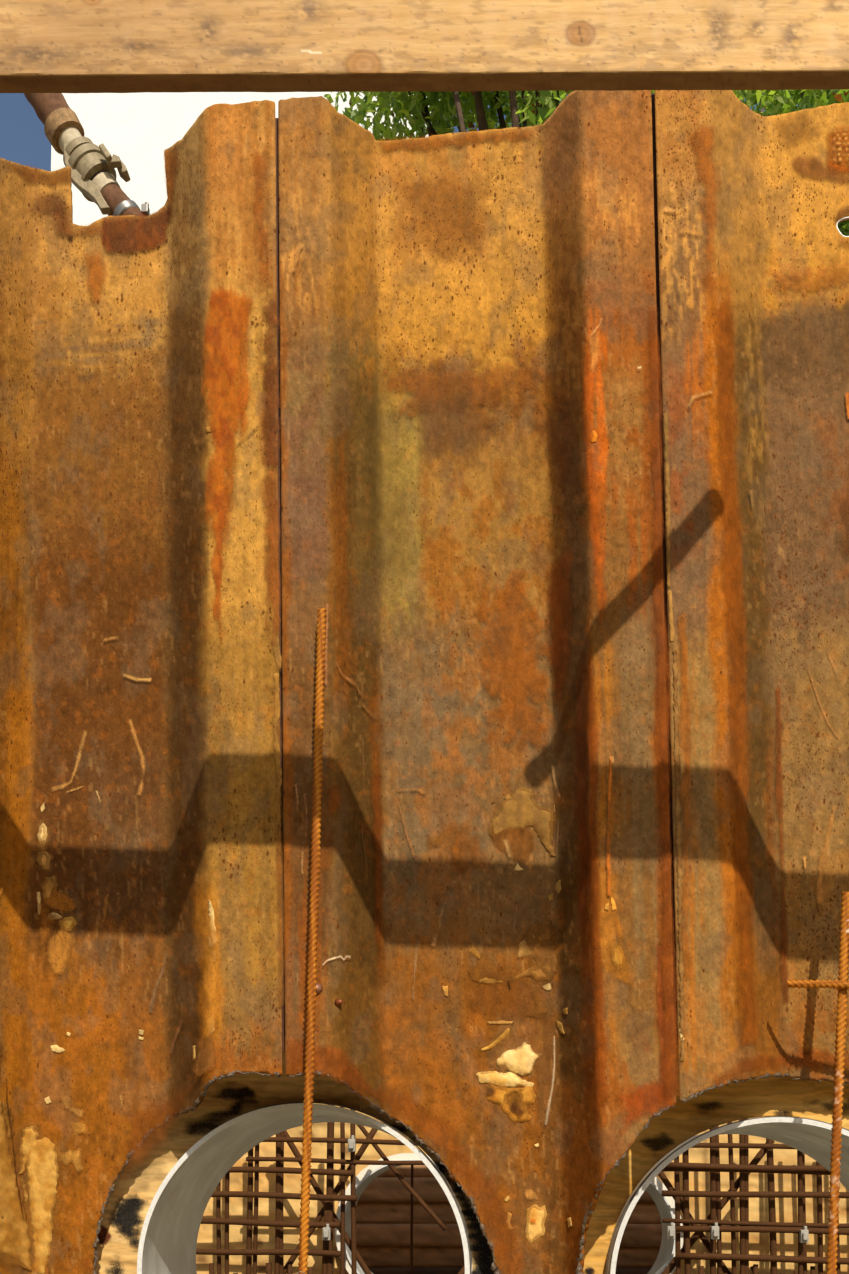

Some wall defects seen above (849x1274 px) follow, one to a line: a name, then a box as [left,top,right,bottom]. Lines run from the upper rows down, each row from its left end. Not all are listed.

corrosion [12,149,177,299]
corrosion [381,130,532,149]
corrosion [827,126,849,173]
corrosion [203,286,280,633]
corrosion [584,335,606,622]
corrosion [623,307,680,1122]
peeling [36,804,76,973]
peeling [489,787,556,871]
corrosion [588,677,630,1105]
corrosion [288,1041,375,1093]
peeling [468,919,568,1123]
corrosion [715,1049,849,1084]